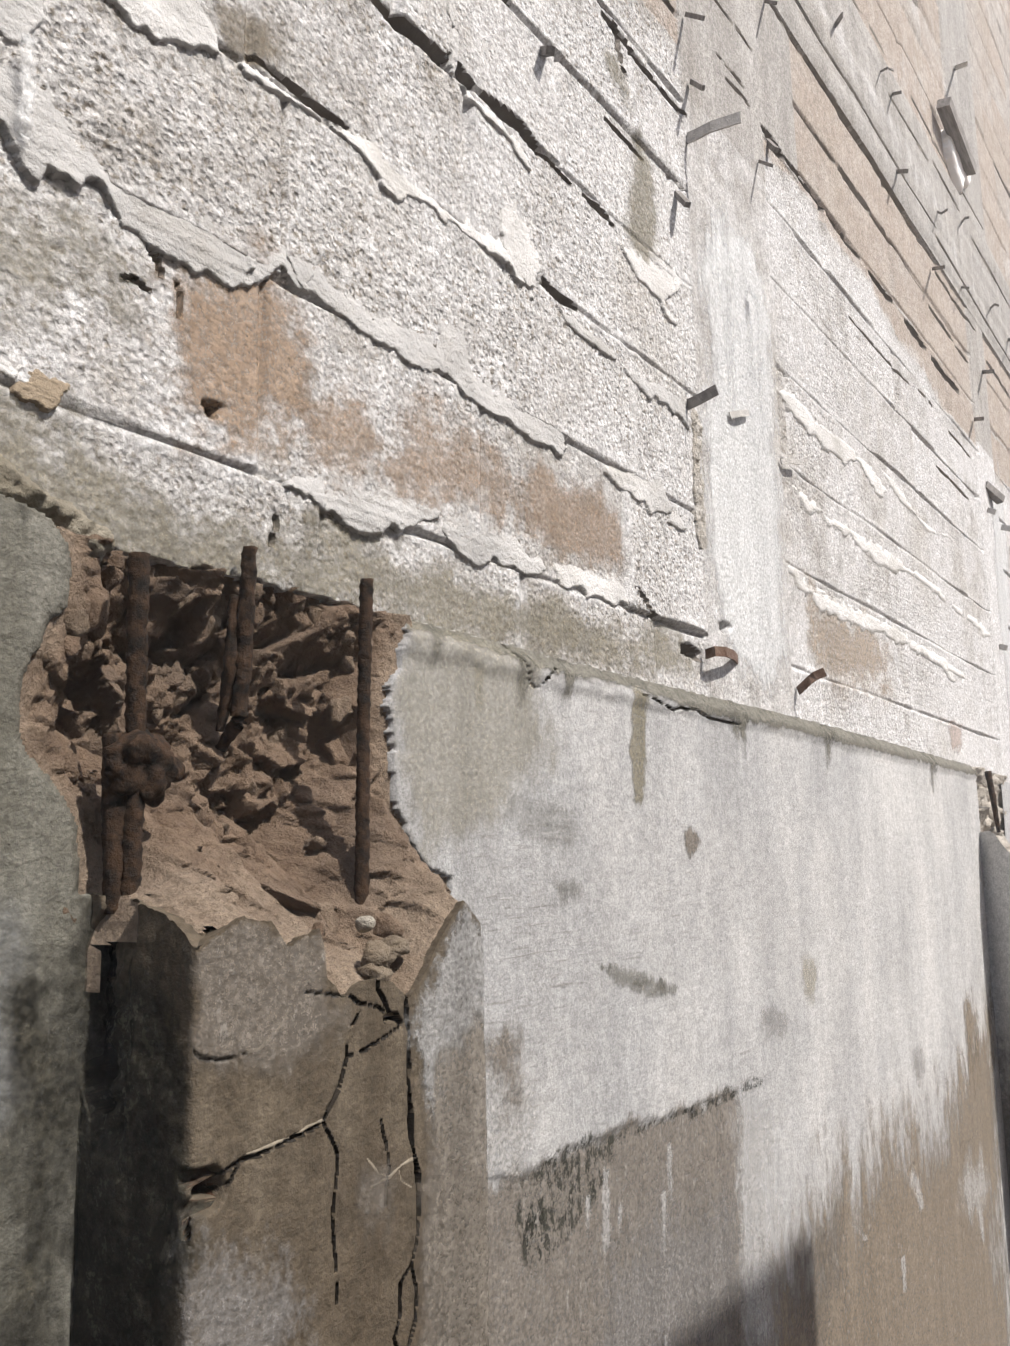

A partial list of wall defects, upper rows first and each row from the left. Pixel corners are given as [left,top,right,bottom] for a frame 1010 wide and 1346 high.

peeling [172,275,374,470]
spalling [0,454,129,895]
spalling [85,564,458,1004]
peeling [808,604,889,694]
peeling [950,721,962,749]
spalling [972,767,1010,853]
damp [0,895,292,1346]
crack [193,1049,248,1063]
damp [194,923,346,1069]
crack [206,979,422,1346]
peeling [383,1012,401,1023]
damp [486,991,1010,1346]